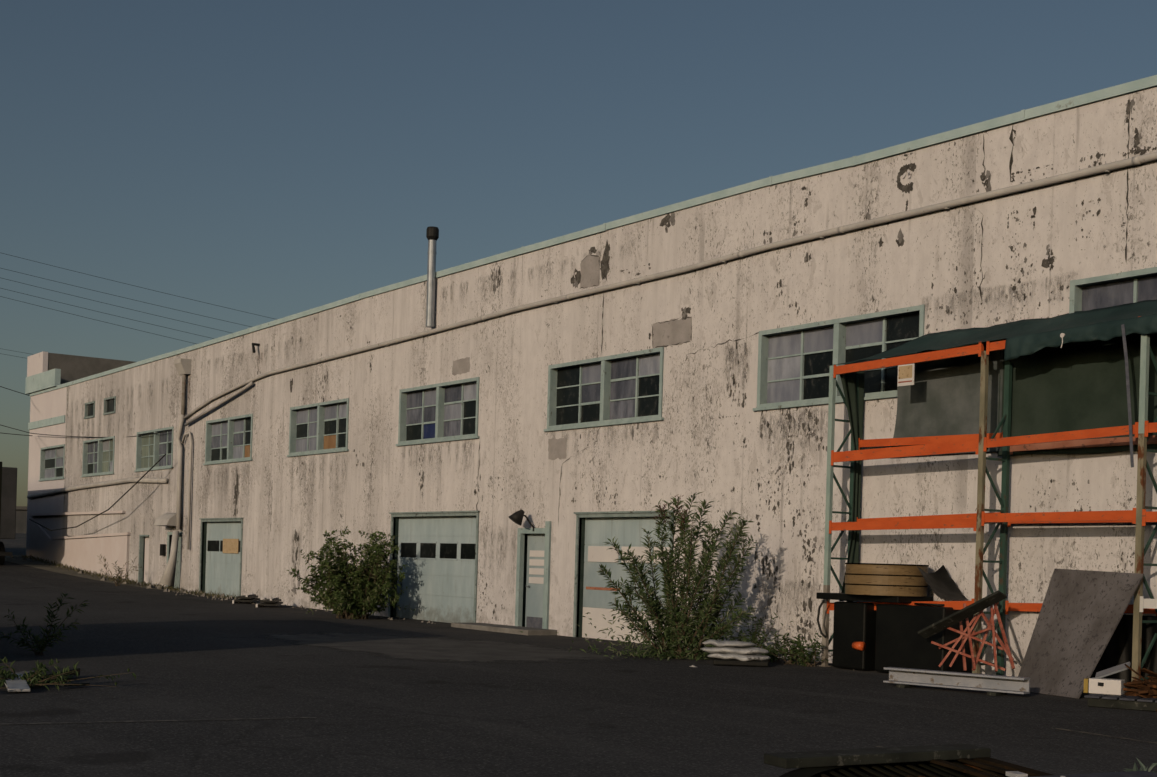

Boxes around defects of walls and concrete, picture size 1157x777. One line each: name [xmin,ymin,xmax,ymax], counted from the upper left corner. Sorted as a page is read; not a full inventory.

peeling [571,241,651,288]
crack [652,317,759,354]
peeling [719,340,827,642]